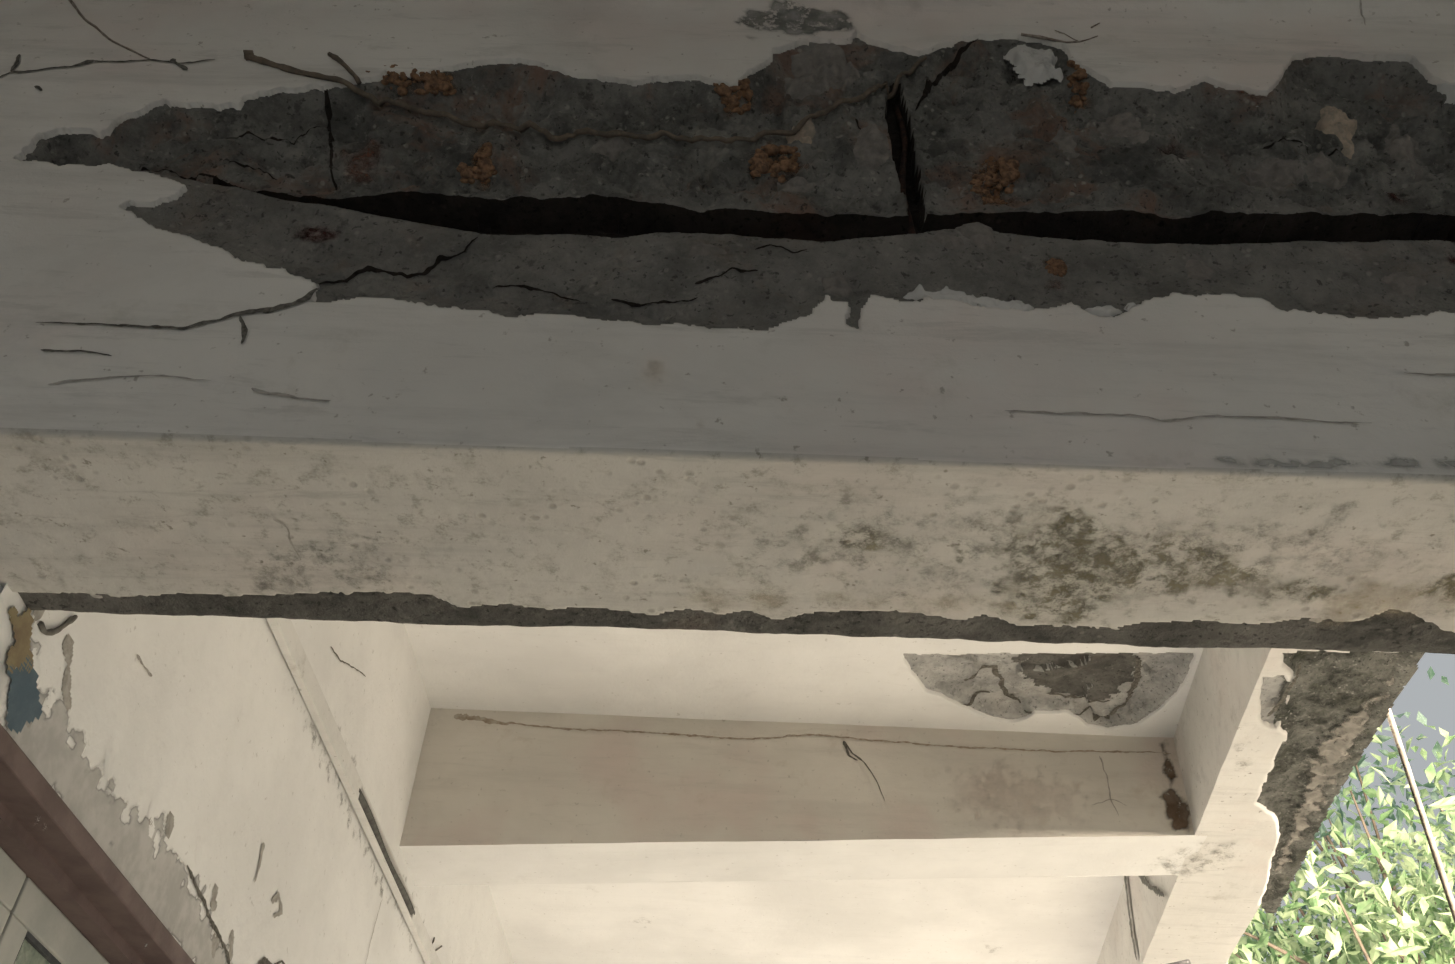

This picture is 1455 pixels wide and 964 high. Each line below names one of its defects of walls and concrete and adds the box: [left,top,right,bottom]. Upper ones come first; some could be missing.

crack [0,54,215,91]
spalling [22,0,1455,331]
crack [36,288,318,385]
crack [1404,370,1455,378]
crack [1005,410,1372,423]
flaking render [1257,458,1349,468]
leakage [1116,535,1256,596]
leakage [1268,581,1335,600]
flaking render [5,591,1455,964]